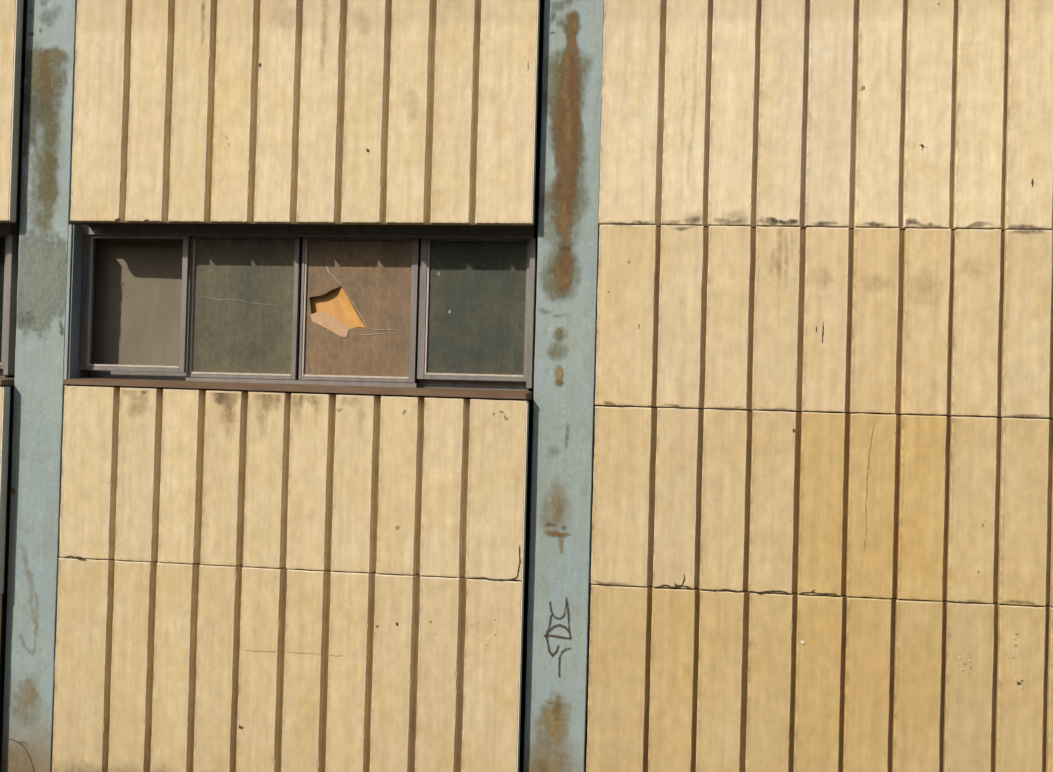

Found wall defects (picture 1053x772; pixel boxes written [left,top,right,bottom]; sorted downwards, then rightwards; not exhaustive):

leakage [24,147,58,230]
rust [543,13,586,299]
rust [555,367,563,385]
rust [546,493,567,552]
crack [864,426,874,549]
rust [530,699,564,772]